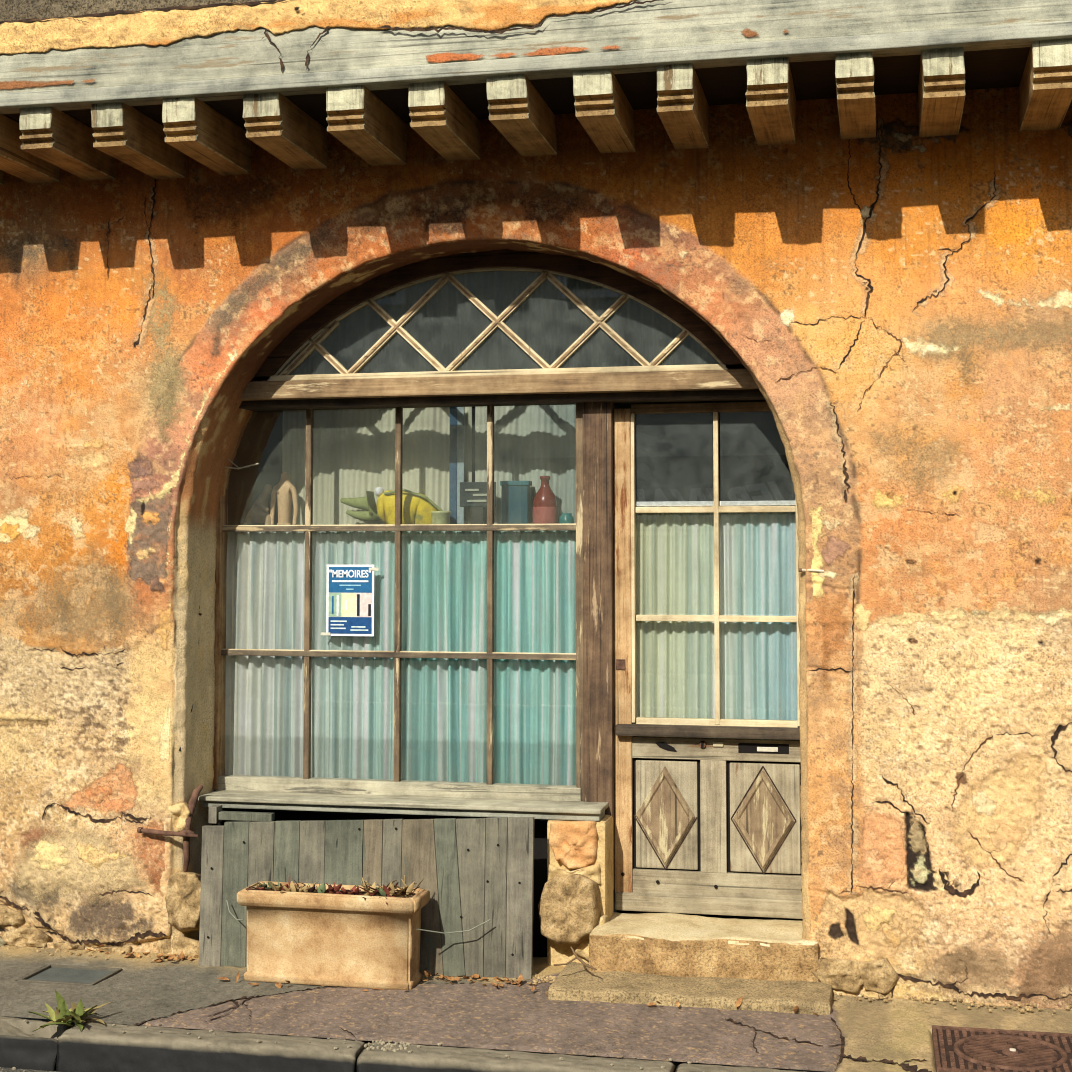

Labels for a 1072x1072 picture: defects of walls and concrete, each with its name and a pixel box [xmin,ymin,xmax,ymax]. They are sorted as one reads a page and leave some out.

crack [0,0,329,73]
peeling [426,46,588,63]
crack [378,0,663,34]
water stain [423,206,468,232]
crack [742,117,907,502]
peeling [853,604,1072,631]
crack [809,573,1072,897]
flaking render [57,764,137,815]
flaking render [952,751,1047,867]
crack [0,891,166,947]
flaking render [814,812,949,962]
water stain [918,925,1072,1004]